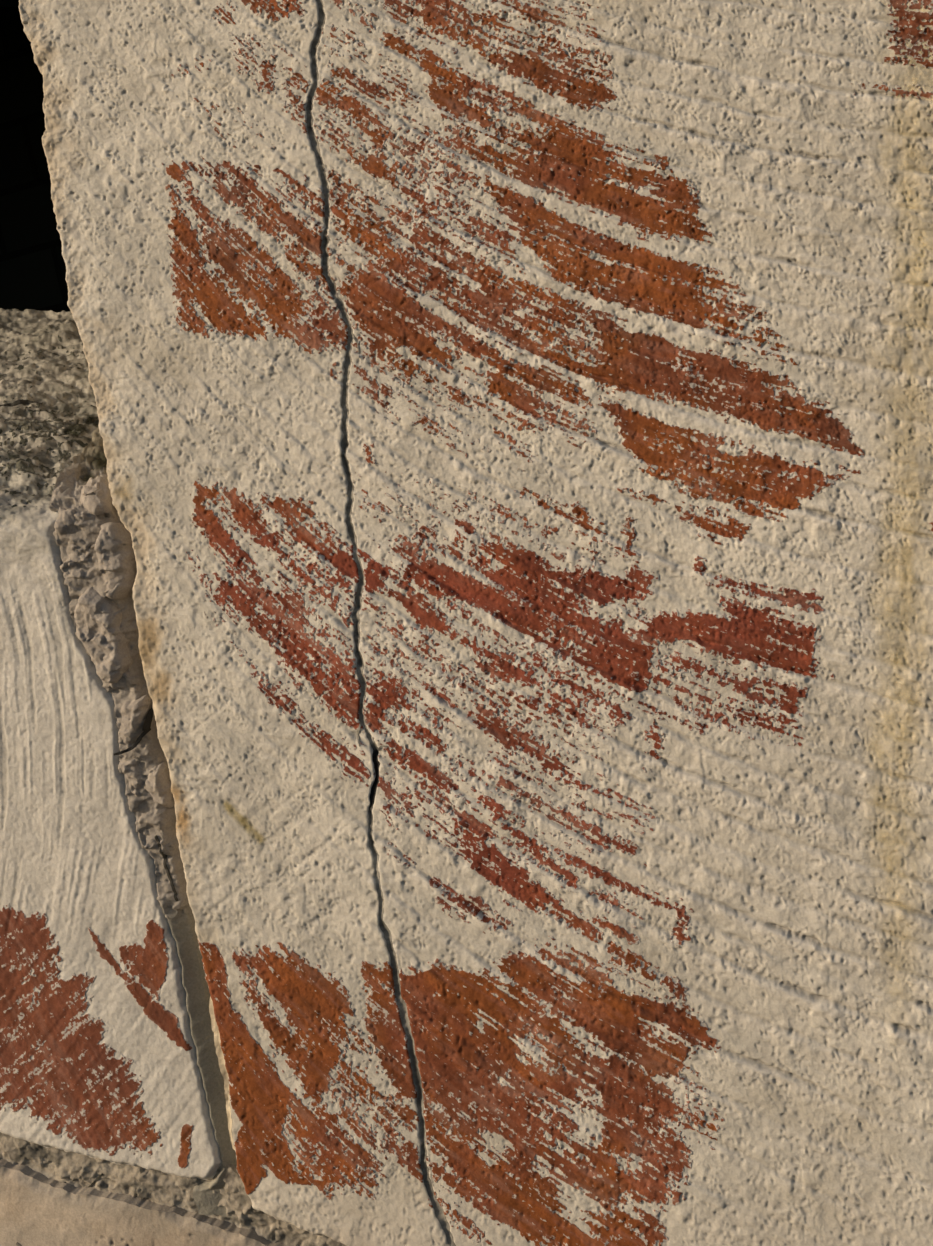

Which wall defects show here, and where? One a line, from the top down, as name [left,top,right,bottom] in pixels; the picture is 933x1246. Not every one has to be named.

crack [306,0,456,1246]